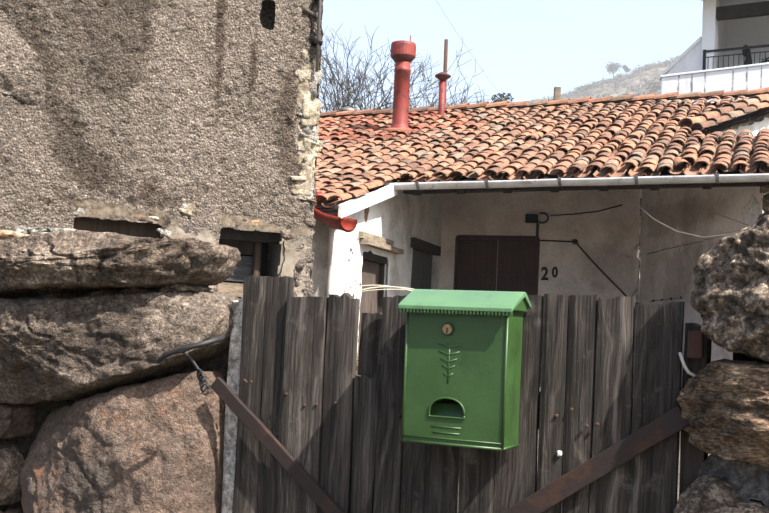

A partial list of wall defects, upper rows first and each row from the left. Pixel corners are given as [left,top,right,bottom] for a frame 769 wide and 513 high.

spalling [290,50,324,205]